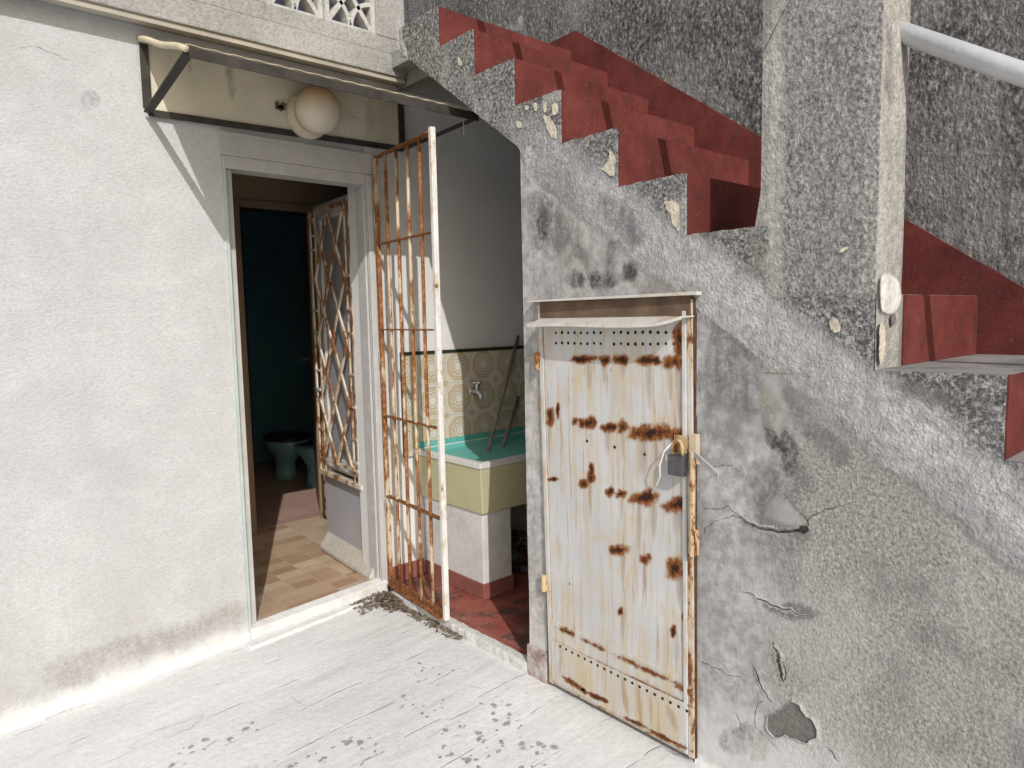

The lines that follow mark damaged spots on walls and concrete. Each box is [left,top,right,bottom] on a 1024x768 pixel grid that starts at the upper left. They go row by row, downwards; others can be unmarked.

peeling [525,102,559,138]
peeling [601,150,616,176]
peeling [664,200,681,231]
damp [572,241,638,288]
rust [571,297,697,441]
rust [578,463,595,488]
rust [605,465,697,529]
crack [704,499,853,538]
crack [742,589,811,618]
rust [560,556,697,759]
crack [703,641,787,750]
spalling [764,698,822,746]